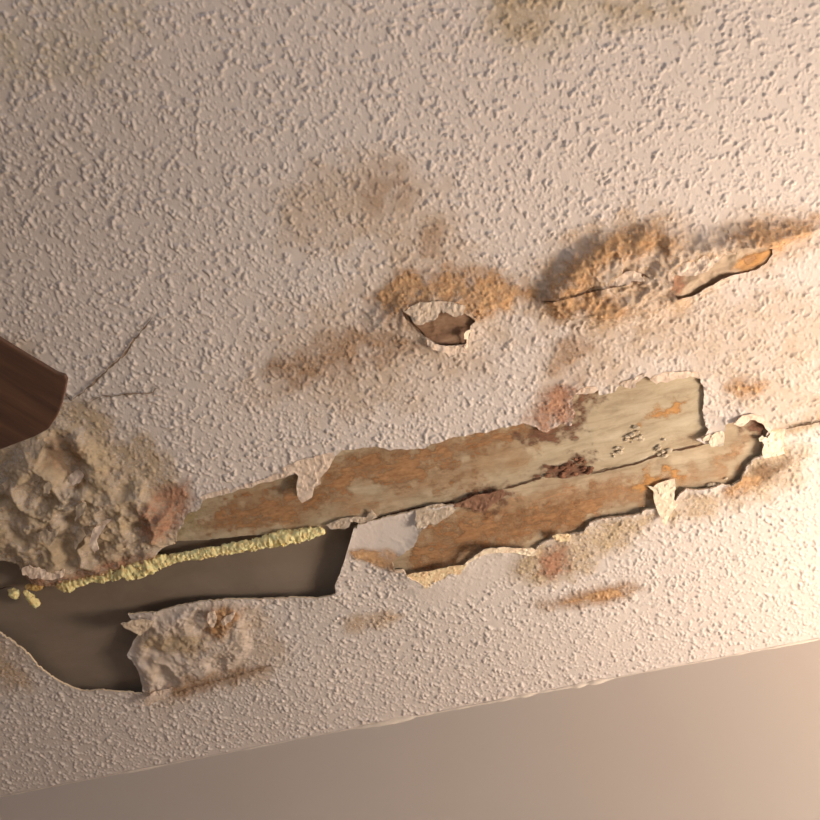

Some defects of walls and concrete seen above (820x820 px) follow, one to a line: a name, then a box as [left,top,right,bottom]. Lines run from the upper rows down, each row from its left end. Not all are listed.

leakage [730,222,811,254]
leakage [544,221,685,328]
leakage [376,266,537,320]
crack [65,317,159,405]
crack [786,421,820,429]
leakage [0,404,189,586]
peeling [176,371,785,589]
peeling [88,519,111,553]
peeling [22,565,65,580]
peeling [121,619,155,636]
peeling [207,611,235,628]